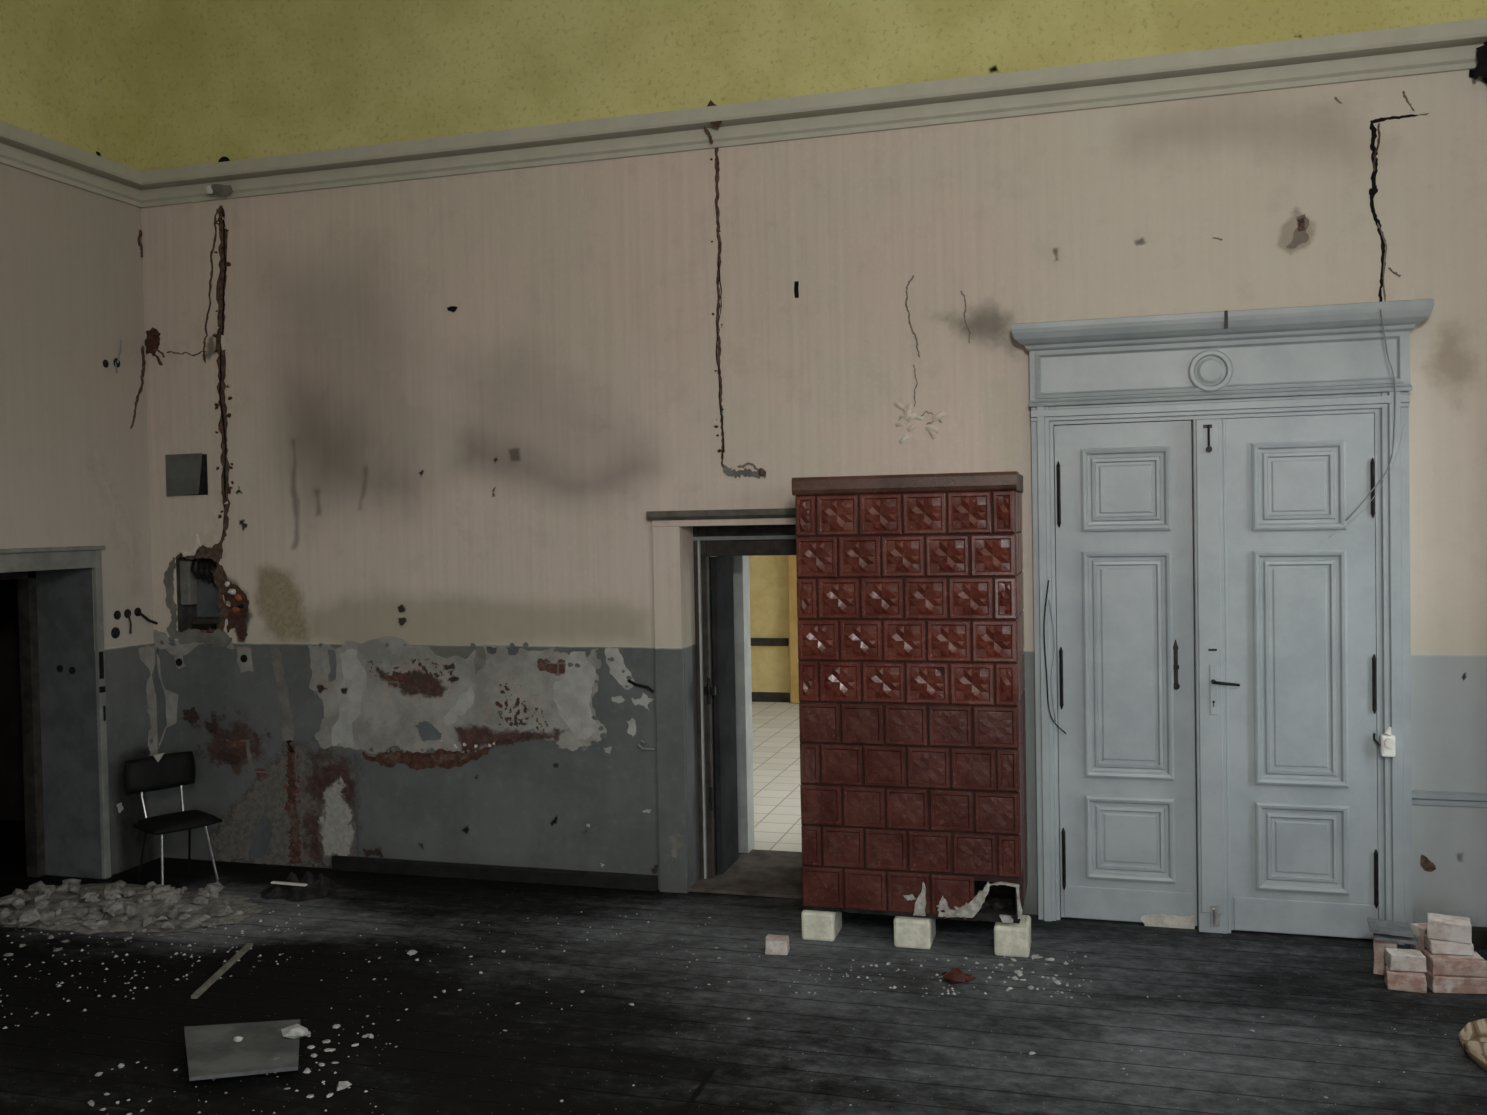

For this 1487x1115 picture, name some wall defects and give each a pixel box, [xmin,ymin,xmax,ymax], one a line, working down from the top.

crack [130,205,234,548]
crack [704,127,766,479]
crack [1369,113,1429,302]
peeling [139,534,654,868]
spalling [903,881,1022,923]